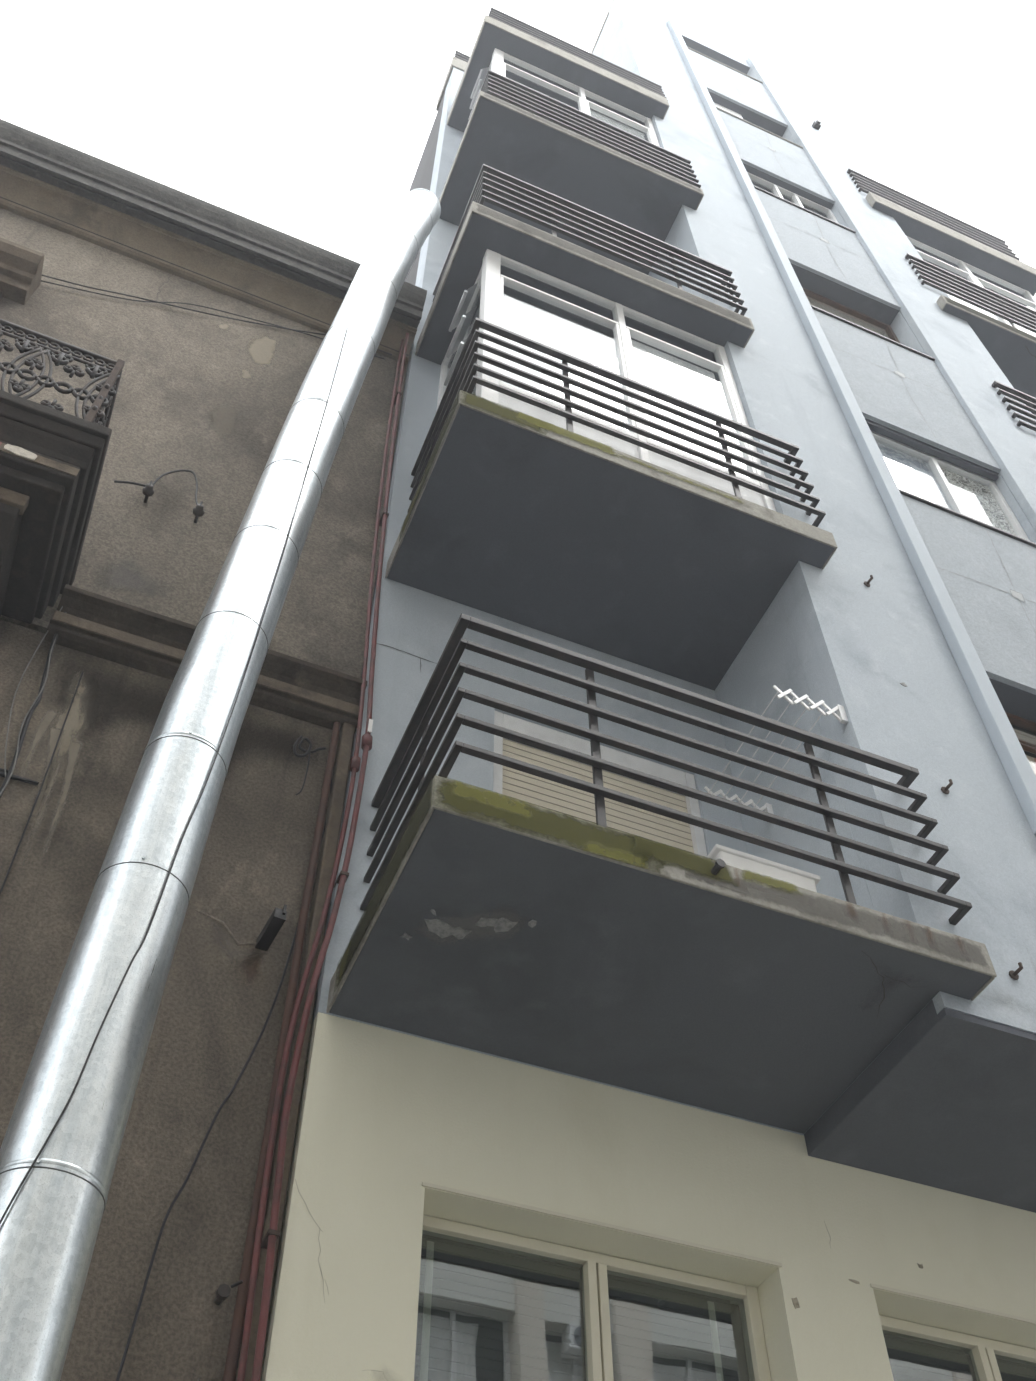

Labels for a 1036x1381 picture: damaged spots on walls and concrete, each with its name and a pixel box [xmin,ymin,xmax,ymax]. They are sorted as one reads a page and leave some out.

water stain [23,673,165,847]
water stain [231,722,309,761]
peeling [401,909,536,942]
crack [295,1179,329,1303]